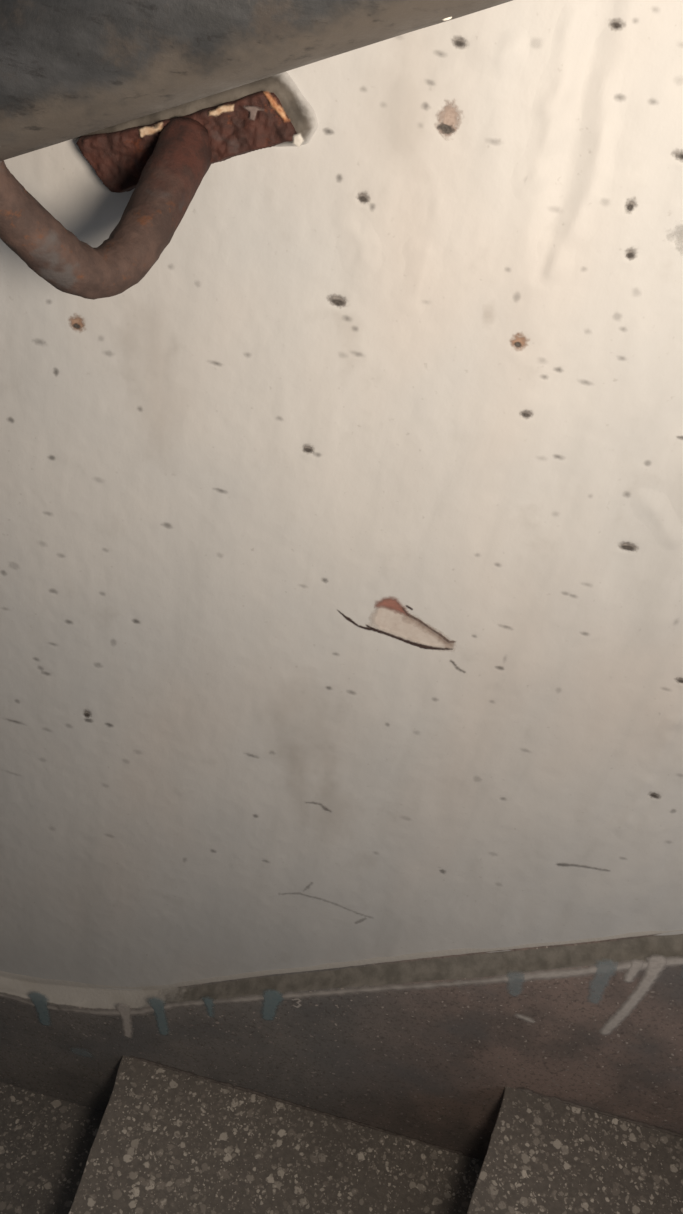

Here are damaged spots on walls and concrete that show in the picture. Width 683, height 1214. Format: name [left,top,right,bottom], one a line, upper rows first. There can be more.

spalling [438,104,459,136]
peeling [339,598,455,650]